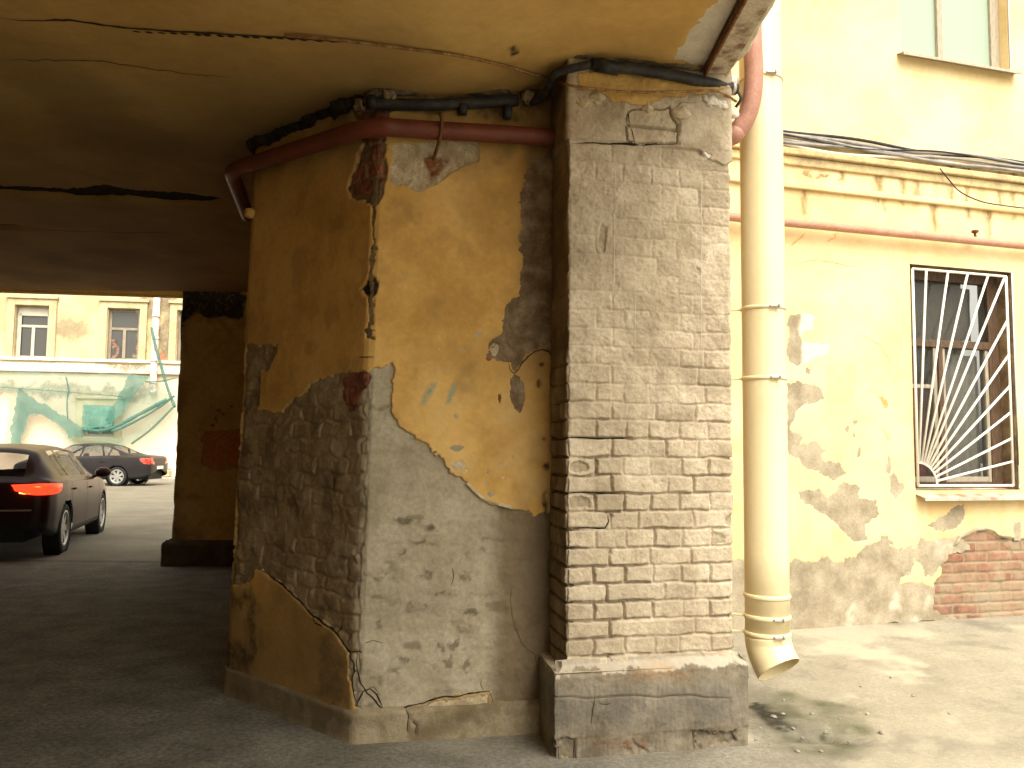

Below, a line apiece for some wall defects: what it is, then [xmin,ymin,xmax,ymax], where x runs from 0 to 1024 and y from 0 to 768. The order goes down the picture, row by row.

crack [4,18,362,45]
flaking render [674,0,737,65]
flaking render [348,137,480,204]
flaking render [626,109,677,145]
flaking render [475,150,554,413]
flaking render [233,343,553,709]
peeling [786,312,879,542]
peeling [886,456,905,499]
flaking render [928,504,1024,619]
crack [258,568,493,734]